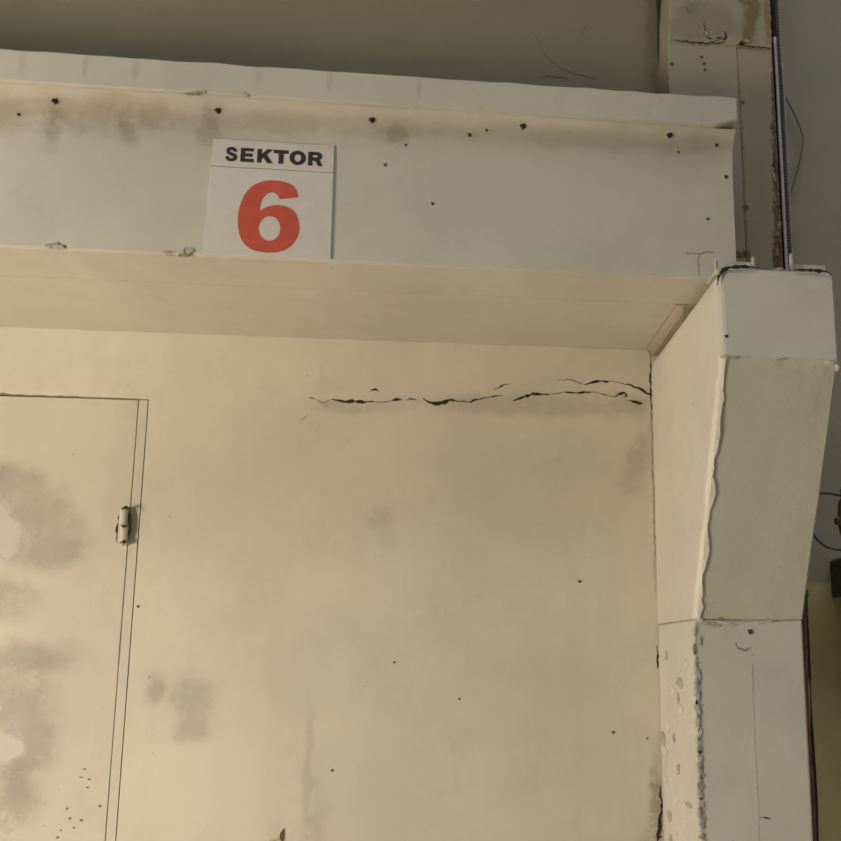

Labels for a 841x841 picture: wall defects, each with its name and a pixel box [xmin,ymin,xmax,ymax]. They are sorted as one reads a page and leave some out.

rust [770,65,783,268]
crack [301,352,656,588]
peeling [667,617,736,841]